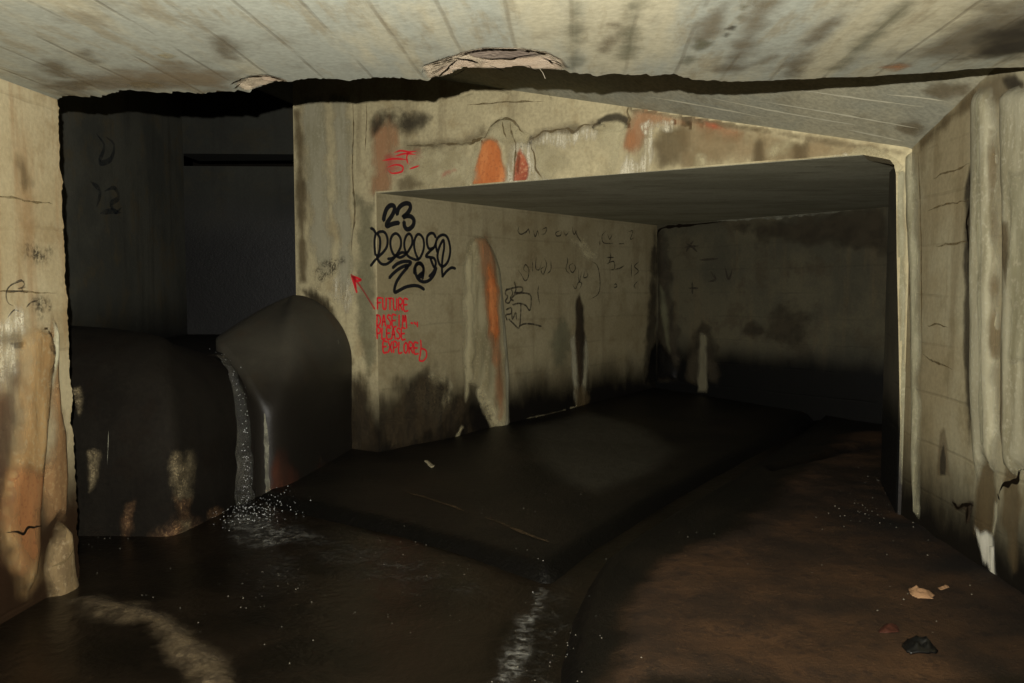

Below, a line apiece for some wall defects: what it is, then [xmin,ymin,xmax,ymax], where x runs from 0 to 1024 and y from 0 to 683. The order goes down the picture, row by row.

leakage [933,12,1024,56]
spalling [423,47,565,77]
spalling [230,75,285,90]
crack [470,98,542,106]
crack [408,137,485,148]
crack [529,124,590,141]
rust [465,137,544,186]
crack [923,163,971,423]
leakage [351,237,509,450]
crack [998,469,1024,500]